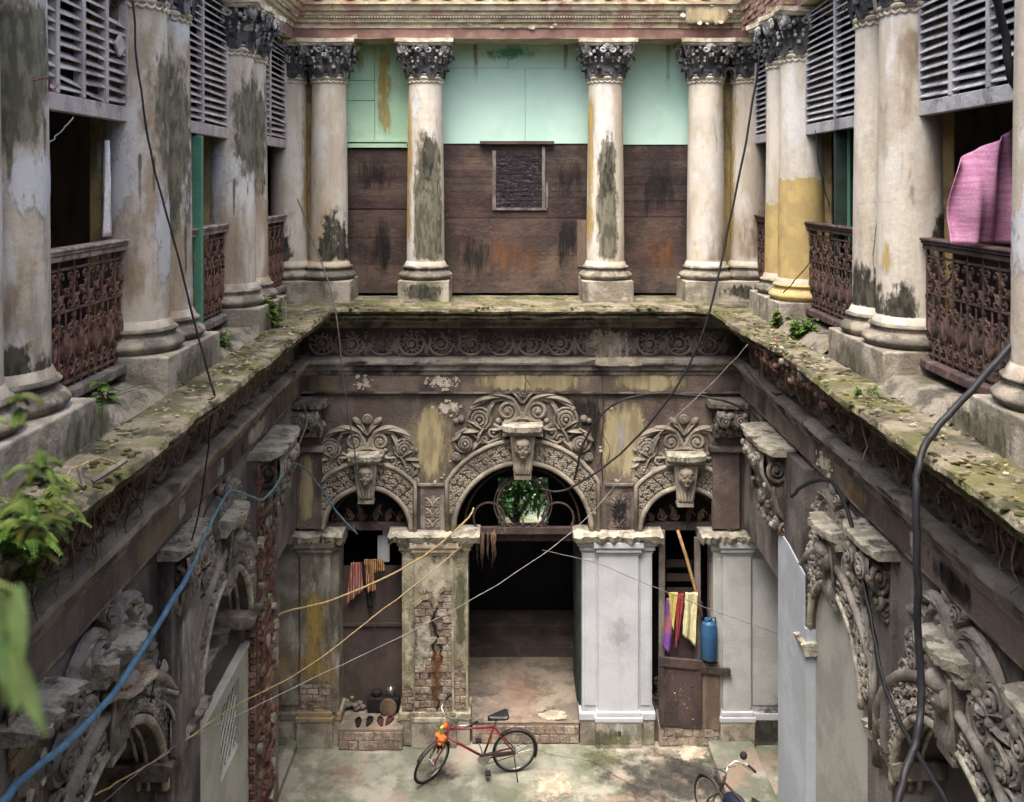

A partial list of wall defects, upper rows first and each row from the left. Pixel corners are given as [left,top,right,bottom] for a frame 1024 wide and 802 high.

damp [379,55,391,131]
damp [138,154,169,193]
flaking render [413,374,462,483]
flaking render [403,561,466,713]
crack [428,607,443,712]
corrosion [432,652,441,703]